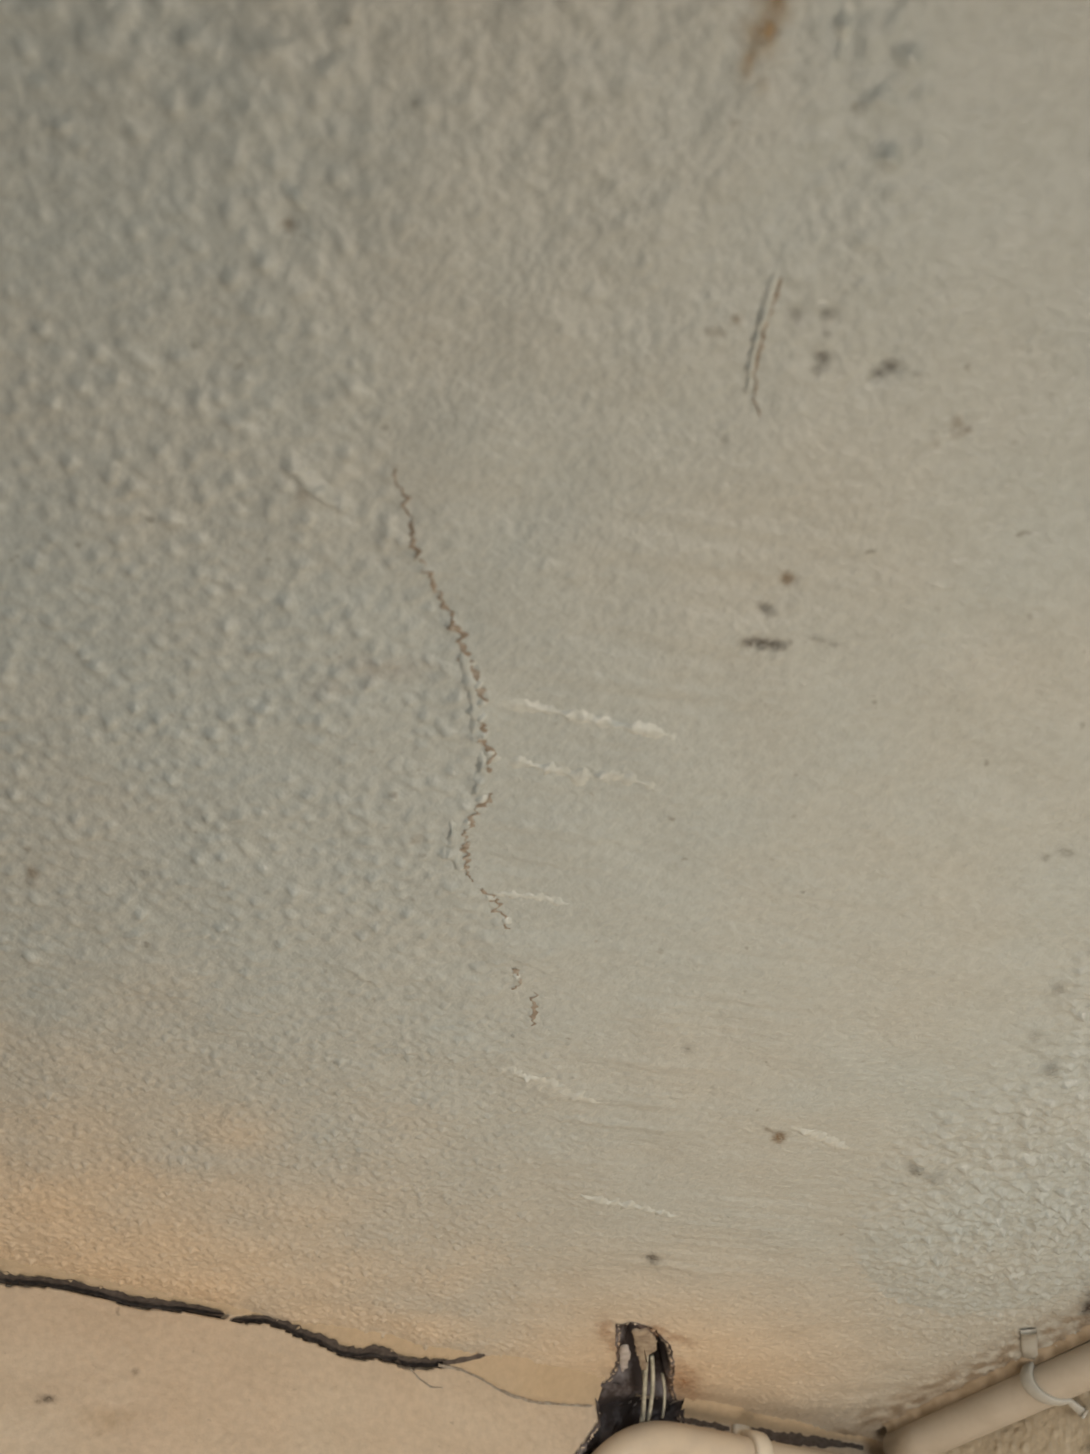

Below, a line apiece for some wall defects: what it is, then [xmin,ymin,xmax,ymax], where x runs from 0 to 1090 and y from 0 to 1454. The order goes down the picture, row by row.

crack [392,468,512,929]
crack [511,969,539,1026]
crack [0,1271,604,1407]
spalling [576,1322,685,1454]